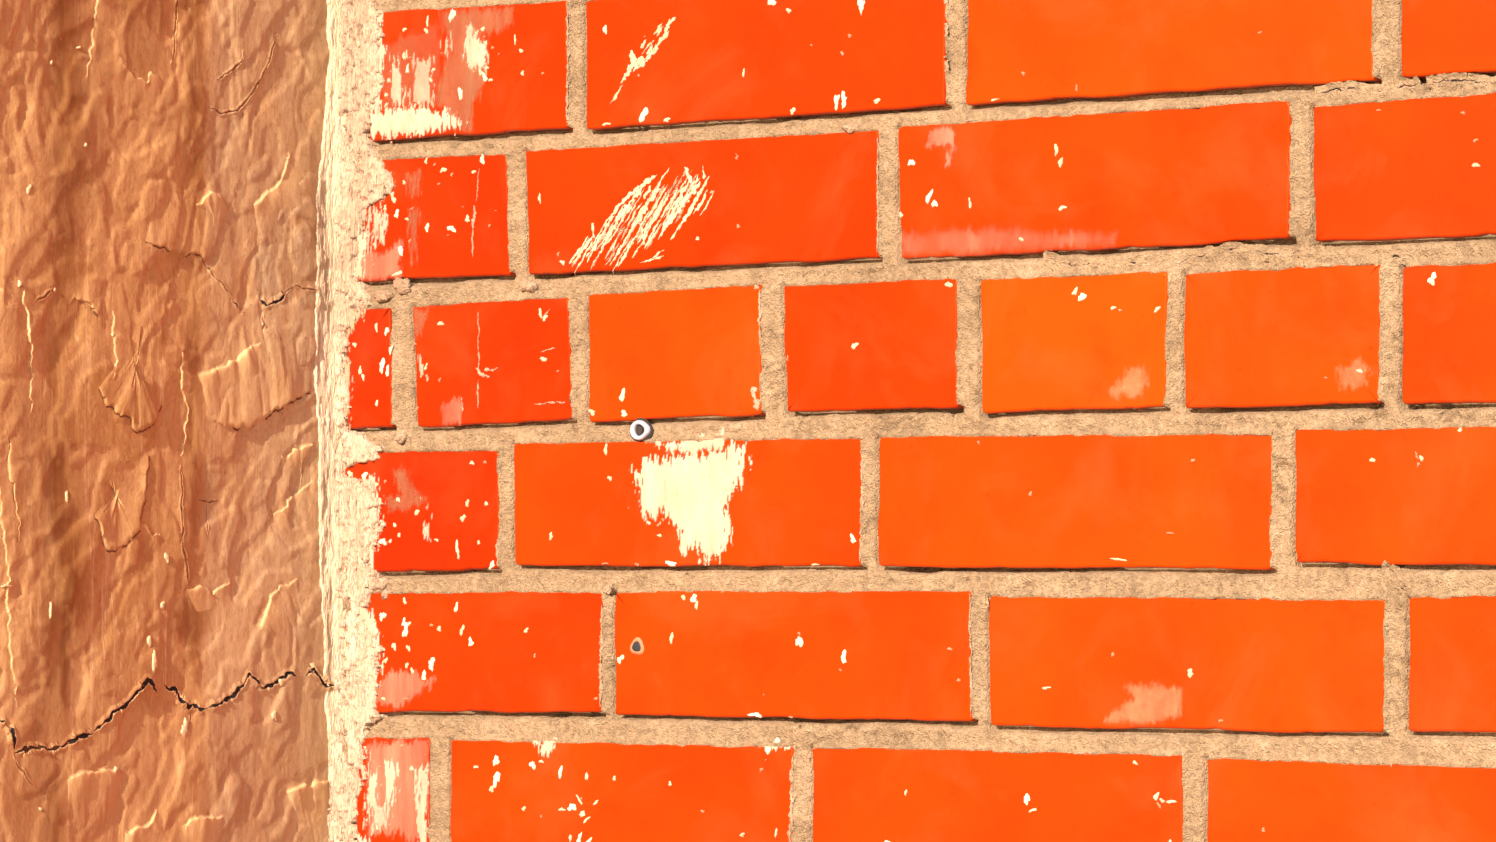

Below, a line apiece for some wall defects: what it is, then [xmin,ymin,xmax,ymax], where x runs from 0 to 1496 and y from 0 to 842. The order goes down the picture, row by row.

crack [35,286,57,304]
crack [0,663,335,791]